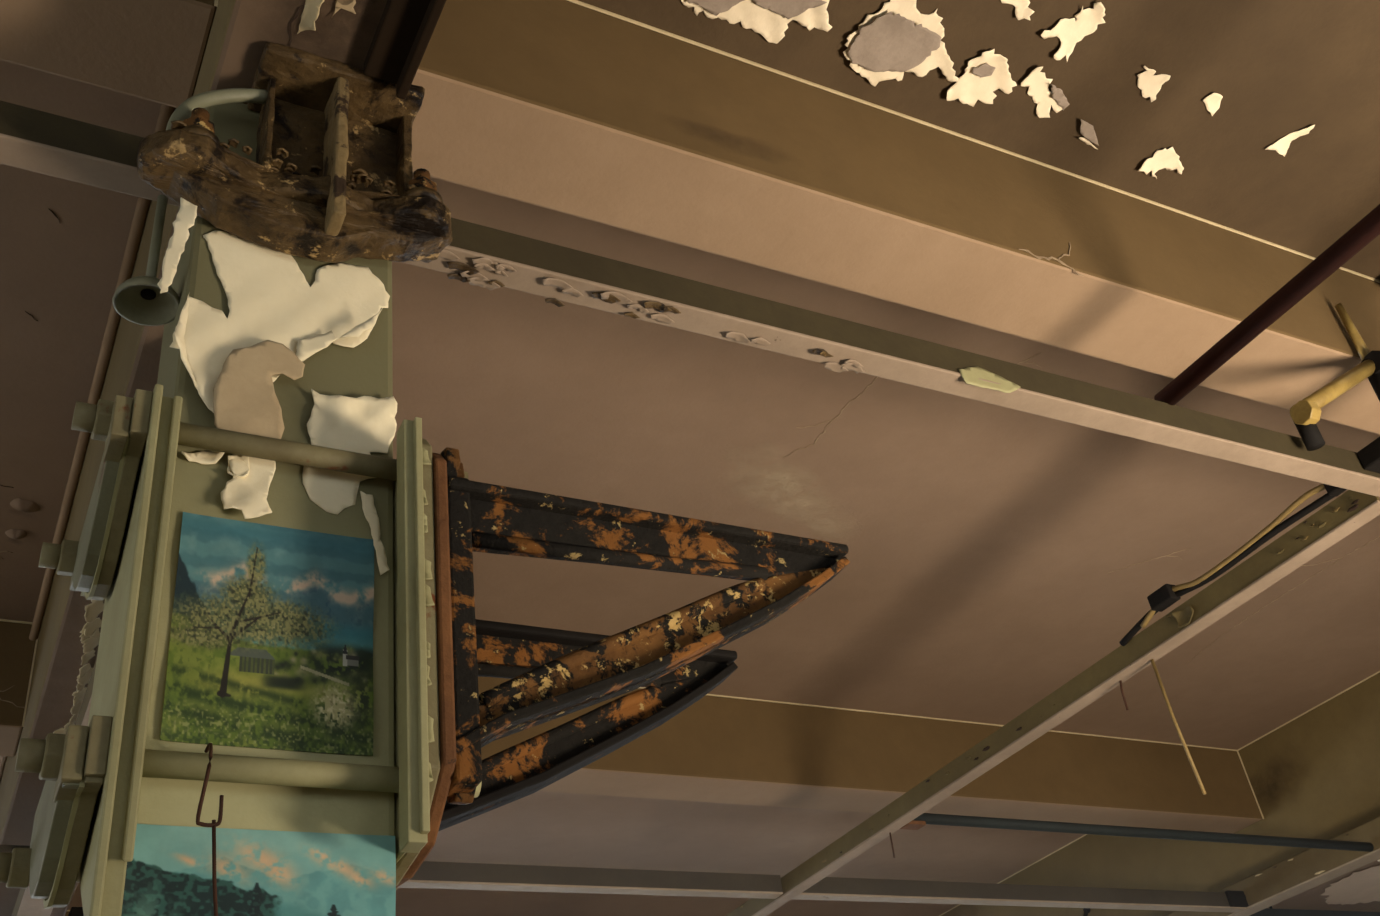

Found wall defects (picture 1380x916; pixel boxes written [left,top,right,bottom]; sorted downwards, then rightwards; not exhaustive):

peeling [681,0,832,44]
peeling [843,0,1105,118]
peeling [1137,65,1171,102]
peeling [1203,93,1223,116]
peeling [1079,119,1099,149]
peeling [1138,147,1184,179]
peeling [1265,125,1315,157]
peeling [157,198,397,455]
peeling [181,451,276,519]
peeling [302,466,390,575]